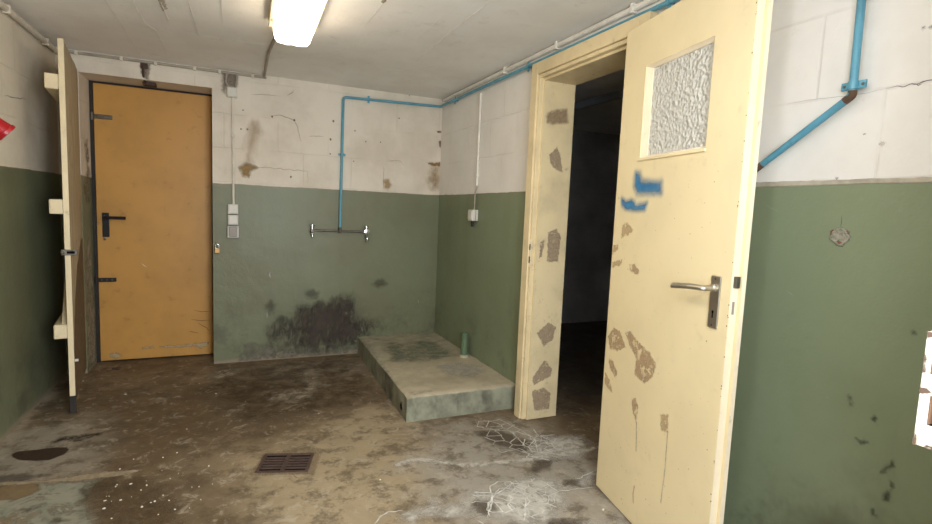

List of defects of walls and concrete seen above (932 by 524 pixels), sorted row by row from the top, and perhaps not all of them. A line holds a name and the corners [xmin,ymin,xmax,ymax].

crack [795,79,932,103]
damp [216,298,374,417]
crack [374,419,597,524]